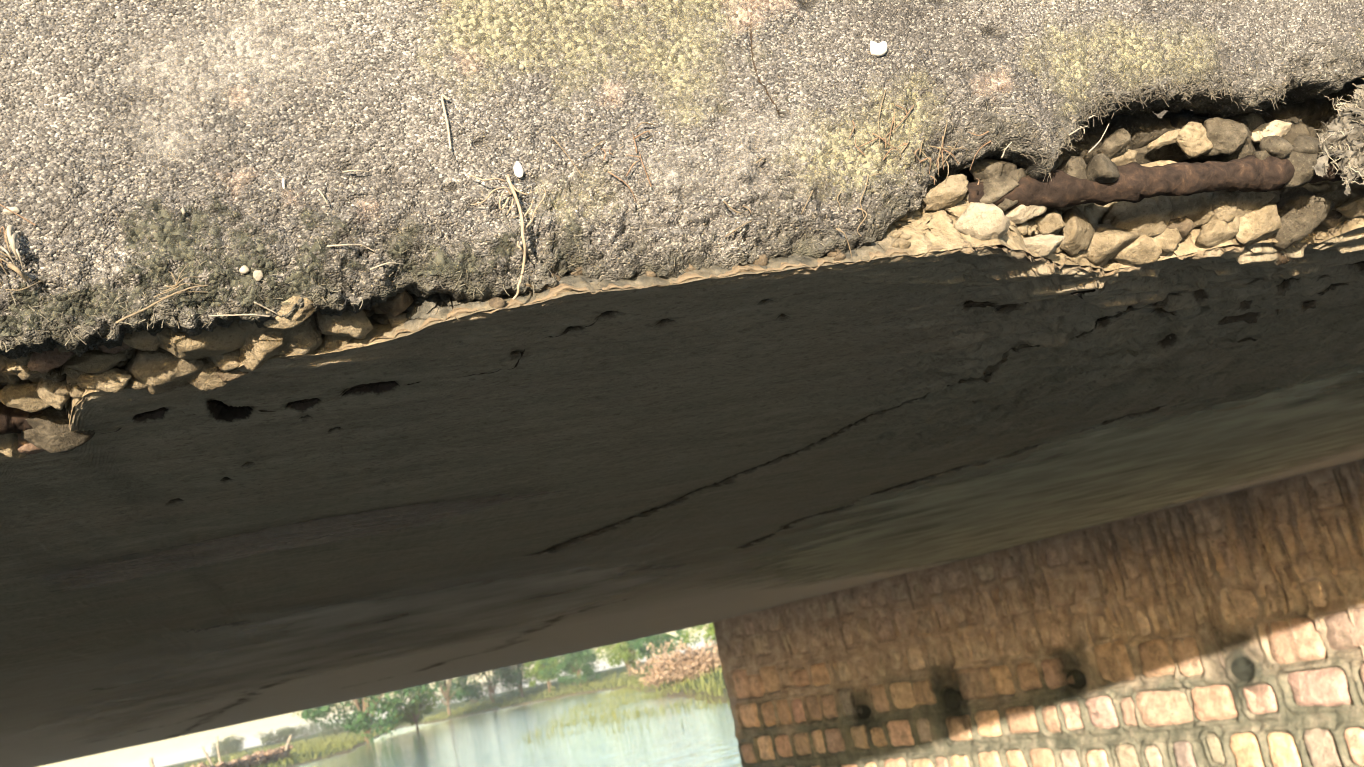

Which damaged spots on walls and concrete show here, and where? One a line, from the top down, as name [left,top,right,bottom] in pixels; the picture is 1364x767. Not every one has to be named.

spalling [0,77,1364,459]